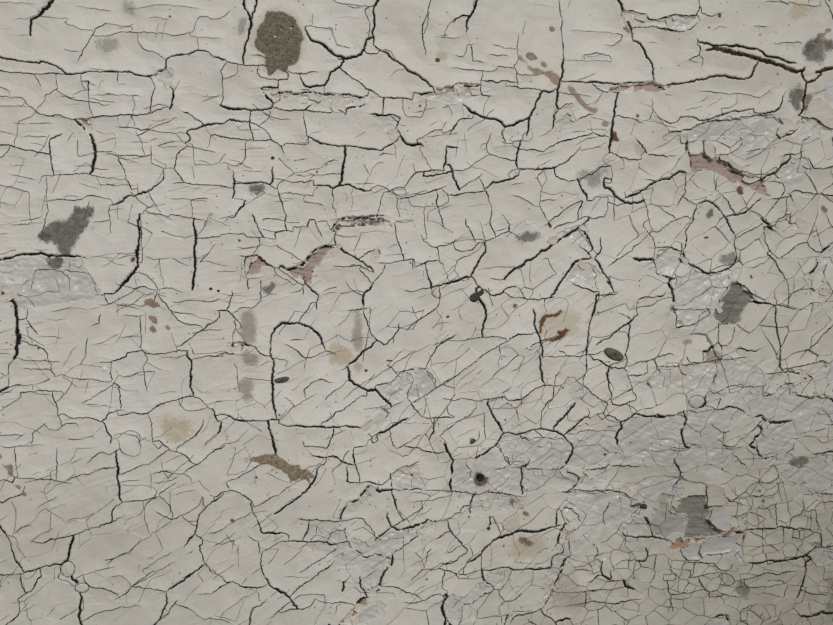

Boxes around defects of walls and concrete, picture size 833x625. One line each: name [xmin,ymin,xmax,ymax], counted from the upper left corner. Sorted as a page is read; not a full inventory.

crack [18,0,54,36]
crack [607,0,833,123]
peeling [608,83,669,93]
crack [652,91,786,132]
crack [714,131,810,181]
crack [0,252,86,273]
damp [38,205,94,269]
peeling [242,232,342,284]
peeling [115,283,229,334]
peeling [245,287,424,381]
peeling [300,97,833,625]
crack [712,415,792,459]